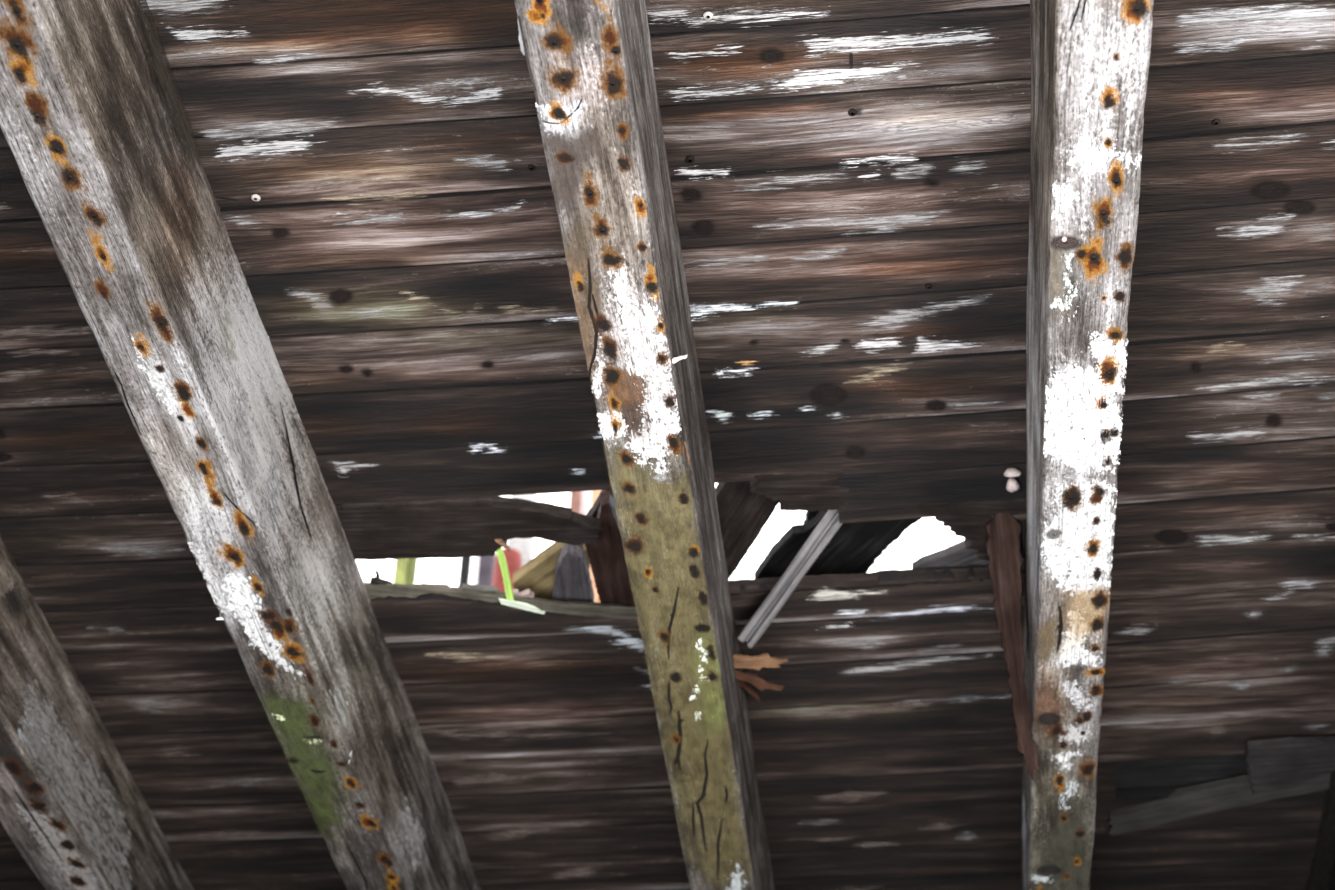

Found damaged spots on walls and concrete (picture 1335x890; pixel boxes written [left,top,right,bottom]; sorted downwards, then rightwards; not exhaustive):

rust [526,0,580,124]
rust [0,0,110,299]
rust [1076,137,1133,279]
rust [134,301,195,422]
crack [587,258,600,379]
rust [595,314,622,433]
water stain [604,369,647,438]
water stain [1049,246,1067,318]
rust [1095,328,1123,409]
rust [195,436,321,727]
rust [1062,485,1109,652]
crack [667,587,728,880]